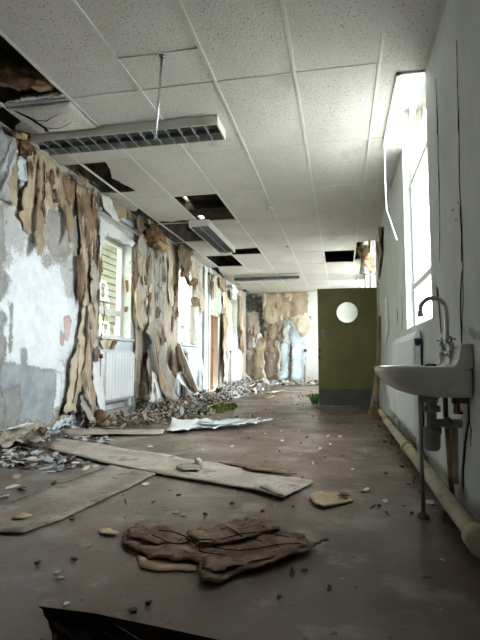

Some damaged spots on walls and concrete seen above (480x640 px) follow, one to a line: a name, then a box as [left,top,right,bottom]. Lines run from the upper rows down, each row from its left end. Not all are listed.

crack [14,110,49,132]
peeling [0,129,60,217]
crack [456,71,464,344]
peeling [60,315,72,346]
peeling [142,243,179,333]
peeling [208,269,230,315]
peeling [246,292,307,381]